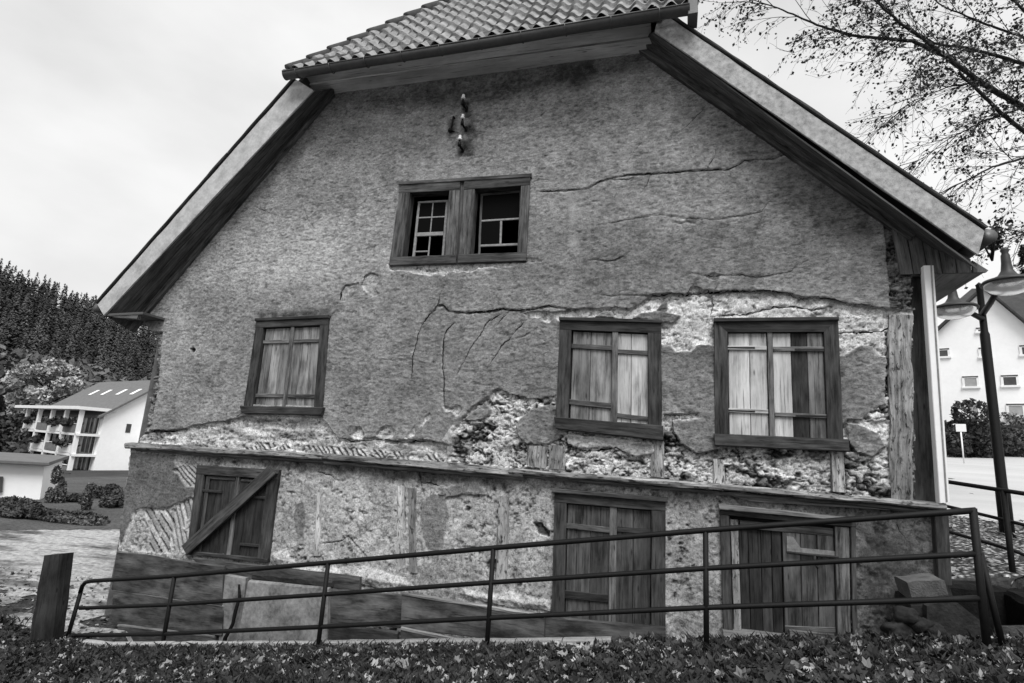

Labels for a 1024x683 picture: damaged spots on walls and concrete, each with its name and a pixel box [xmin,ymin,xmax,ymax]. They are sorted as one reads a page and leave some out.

crack [542,143,783,192]
crack [387,286,564,405]
flaking render [132,228,915,498]